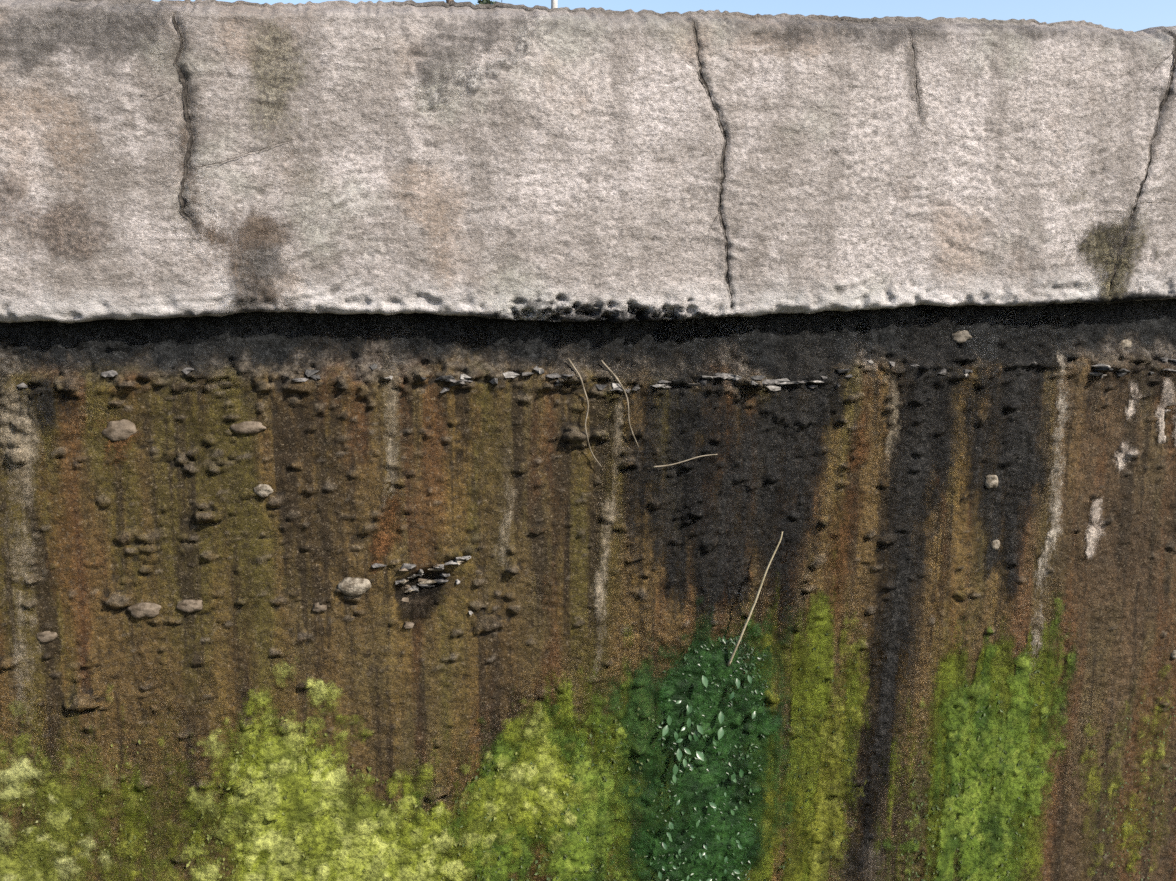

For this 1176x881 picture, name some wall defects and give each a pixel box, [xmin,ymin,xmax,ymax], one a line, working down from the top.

crack [139,14,297,224]
crack [684,19,733,309]
crack [906,25,922,122]
crack [1110,32,1176,289]
damp [0,214,1176,881]